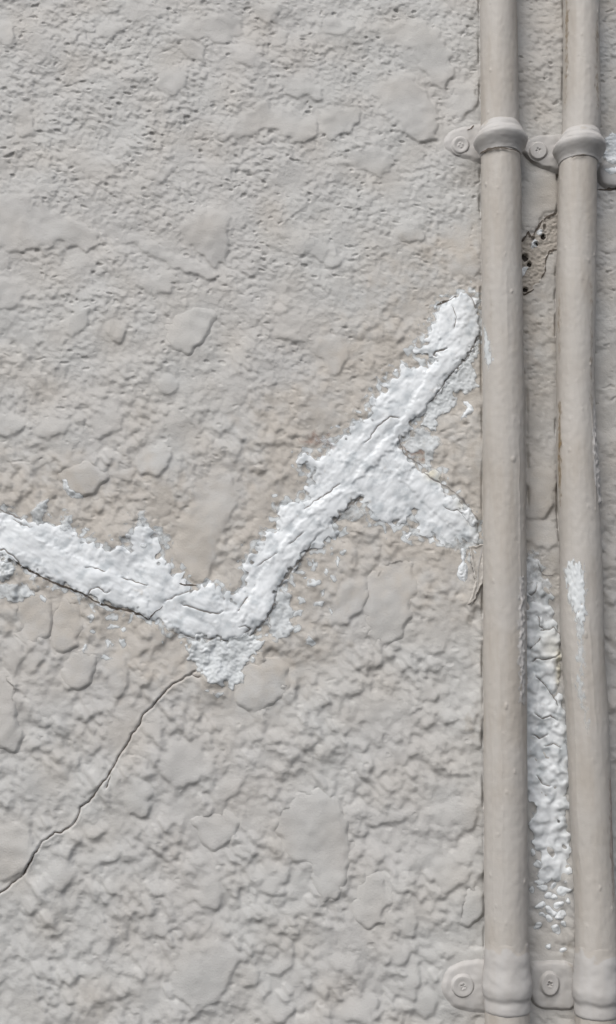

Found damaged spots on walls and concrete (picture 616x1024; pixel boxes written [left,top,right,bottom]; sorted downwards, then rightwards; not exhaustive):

peeling [521,211,558,295]
crack [431,296,480,401]
crack [307,484,360,524]
crack [364,416,479,525]
crack [0,533,311,642]
crack [0,675,201,893]